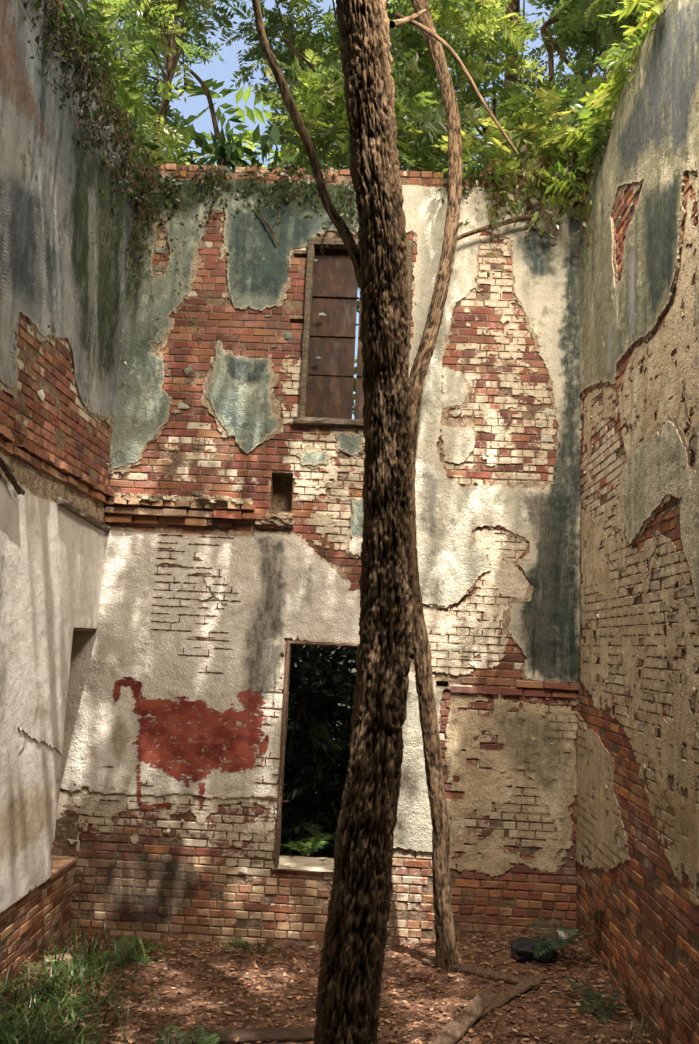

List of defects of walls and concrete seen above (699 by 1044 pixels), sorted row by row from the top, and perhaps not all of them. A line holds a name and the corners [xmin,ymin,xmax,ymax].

leakage [0,180,75,386]
leakage [88,192,100,416]
spalling [0,210,366,674]
leakage [227,357,265,382]
leakage [234,202,312,295]
spalling [406,231,418,377]
leakage [520,208,581,682]
peeling [423,170,699,979]
crack [17,726,62,755]
peeling [56,751,290,874]
spalling [259,686,290,725]